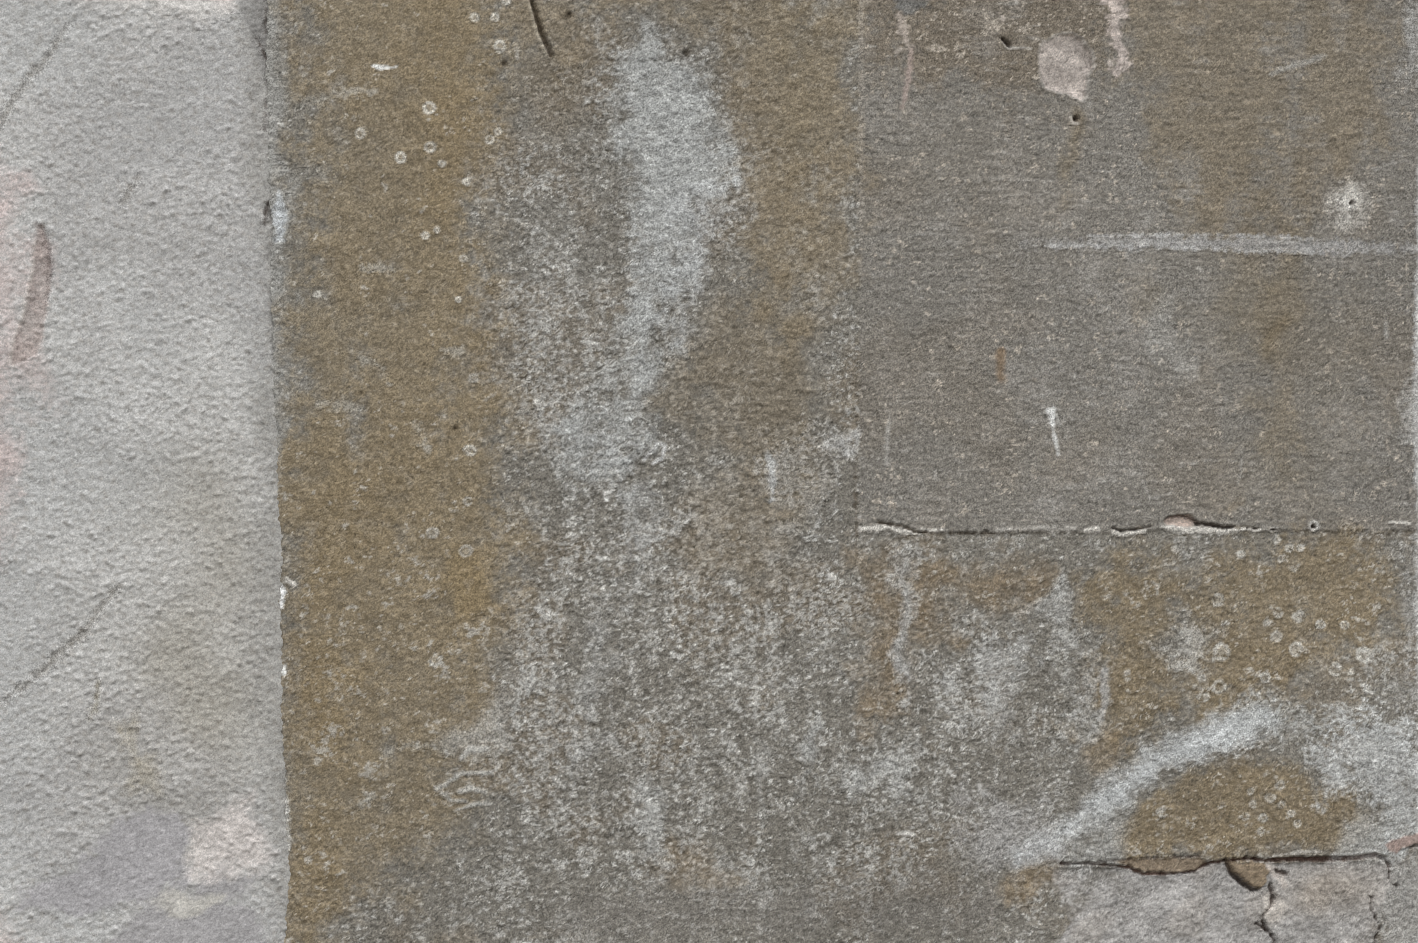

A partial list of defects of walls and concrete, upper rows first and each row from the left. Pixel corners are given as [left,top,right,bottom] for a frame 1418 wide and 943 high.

peeling [893,8,920,111]
spalling [1036,0,1136,126]
crack [852,0,868,246]
damp [267,0,759,943]
damp [484,0,1418,910]
crack [850,457,1415,560]
spalling [1162,512,1200,528]
crack [1115,848,1332,943]
crack [1367,843,1418,943]